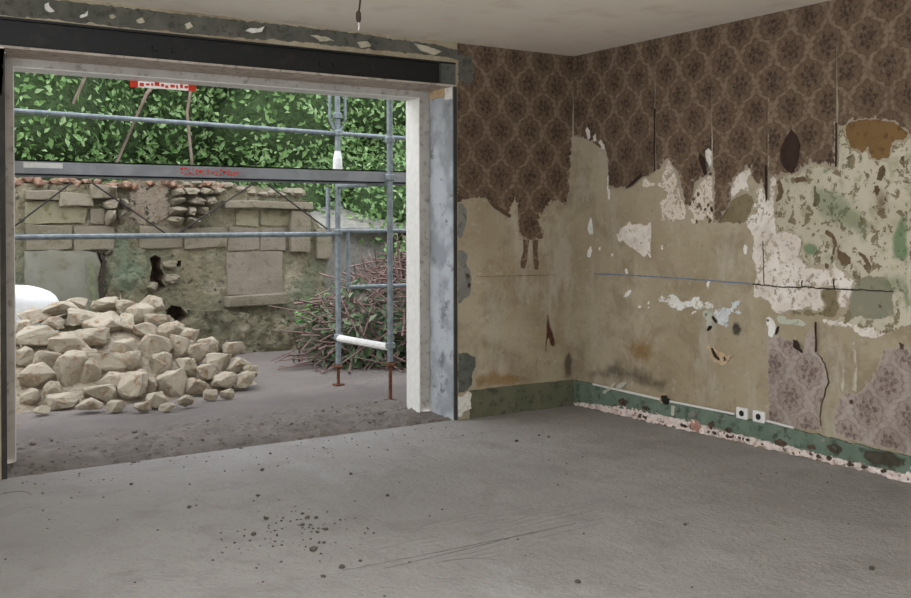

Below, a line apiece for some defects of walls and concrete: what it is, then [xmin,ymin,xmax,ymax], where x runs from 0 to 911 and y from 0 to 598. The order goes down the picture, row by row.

peeling [616,221,663,258]
peeling [642,119,911,339]
flaking render [707,345,733,365]
flaking render [574,382,911,483]